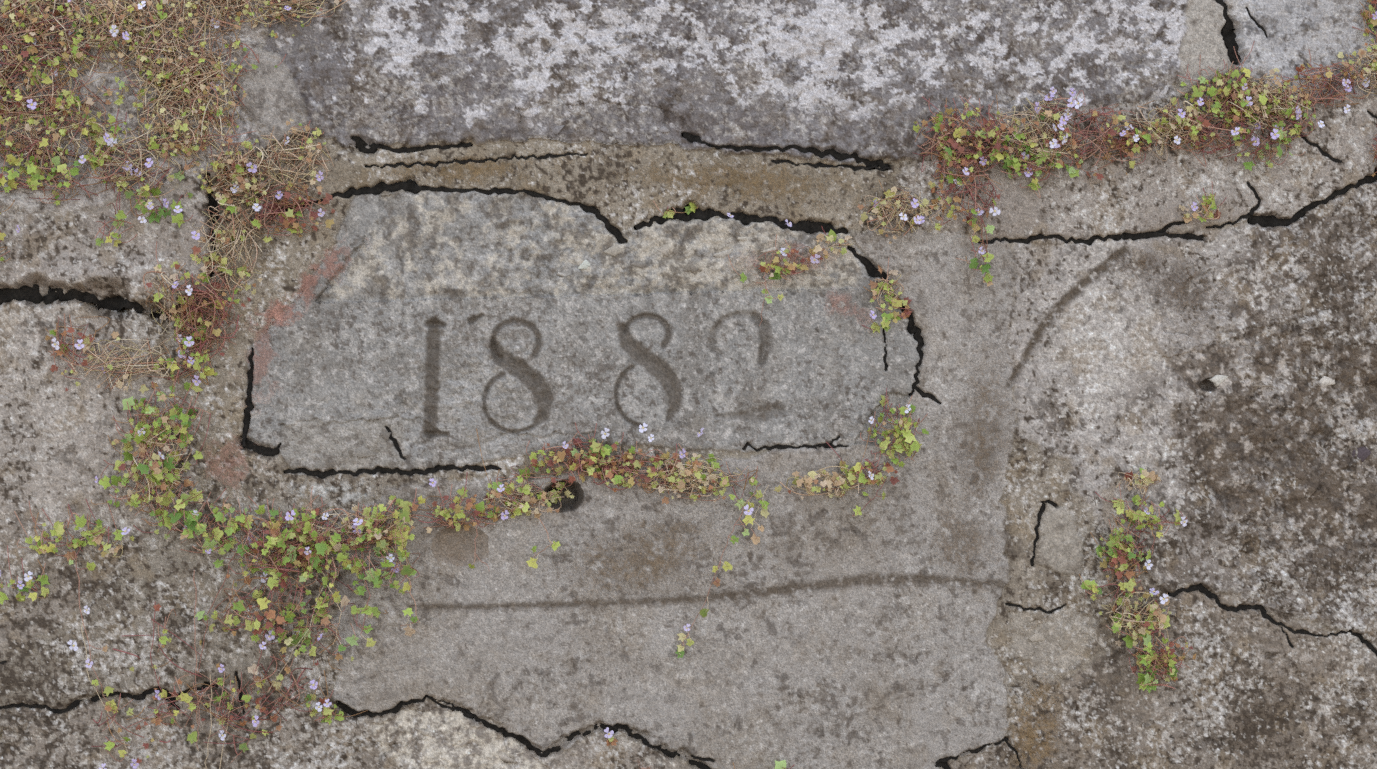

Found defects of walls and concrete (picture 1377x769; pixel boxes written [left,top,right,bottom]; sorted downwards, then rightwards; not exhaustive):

crack [1215,0,1267,65]
crack [977,101,1377,245]
crack [0,284,167,318]
crack [1168,583,1377,656]
crack [336,695,714,769]
crack [936,737,1022,769]